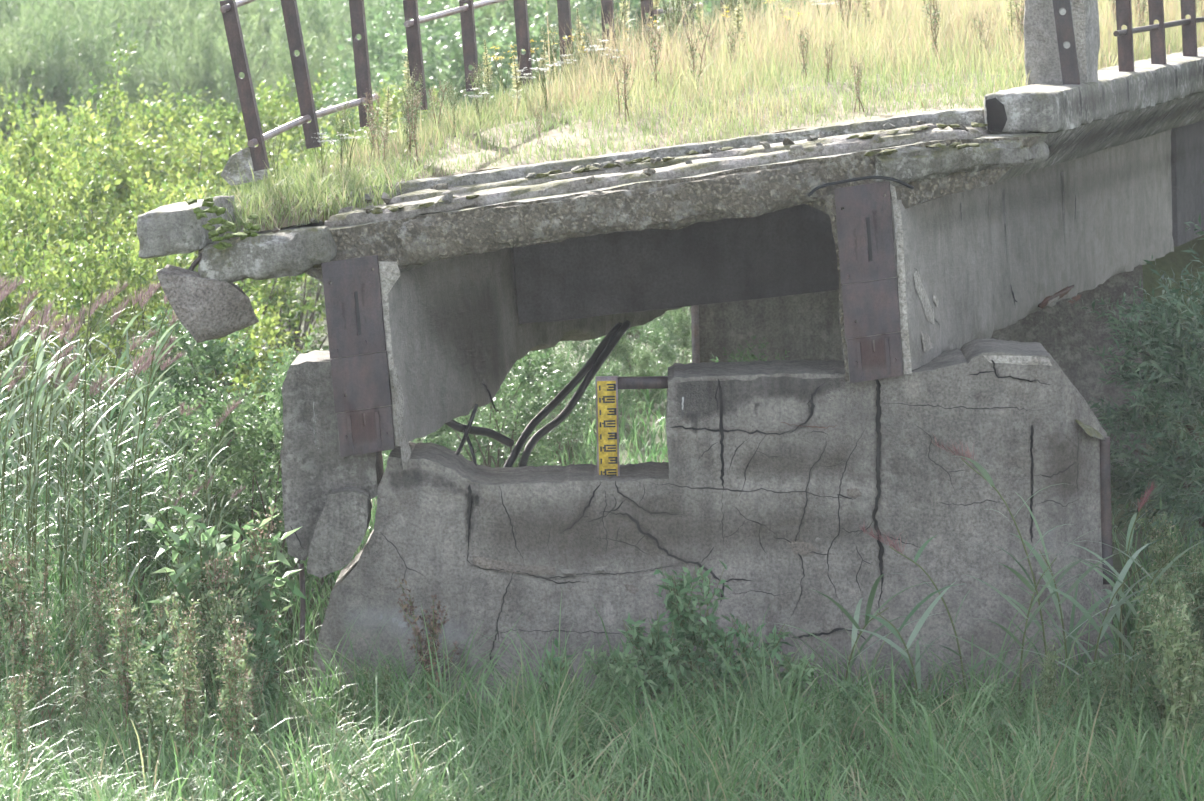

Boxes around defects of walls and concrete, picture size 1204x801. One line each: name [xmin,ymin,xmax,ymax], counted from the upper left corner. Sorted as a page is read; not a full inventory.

spalling [198,226,337,284]
crack [467,360,1079,671]